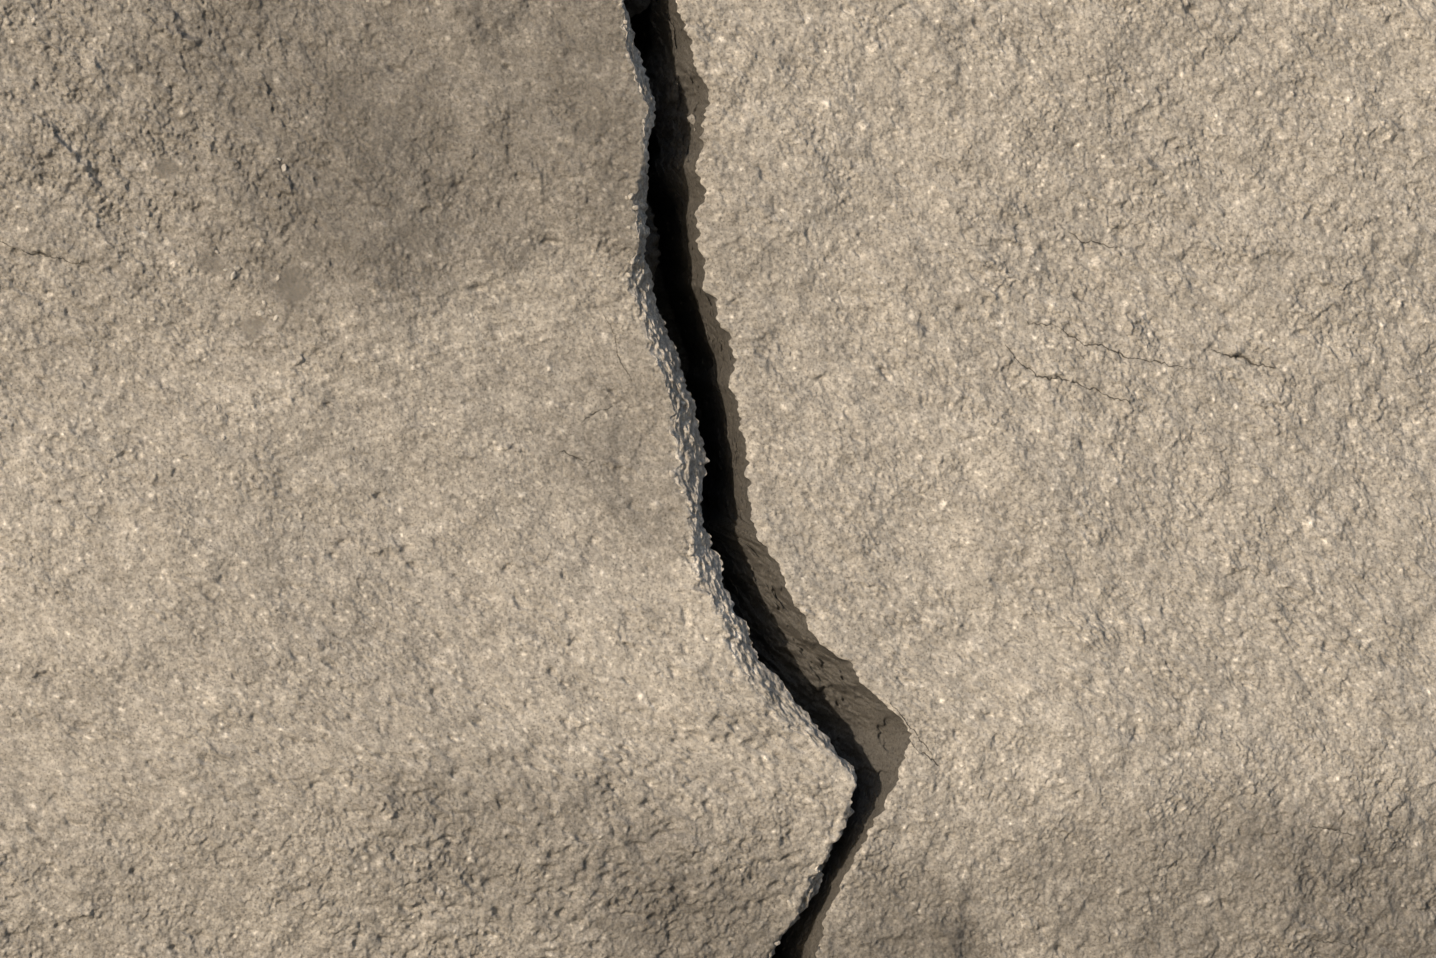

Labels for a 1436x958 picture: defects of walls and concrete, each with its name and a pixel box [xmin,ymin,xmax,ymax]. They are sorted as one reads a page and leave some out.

crack [584,0,940,958]